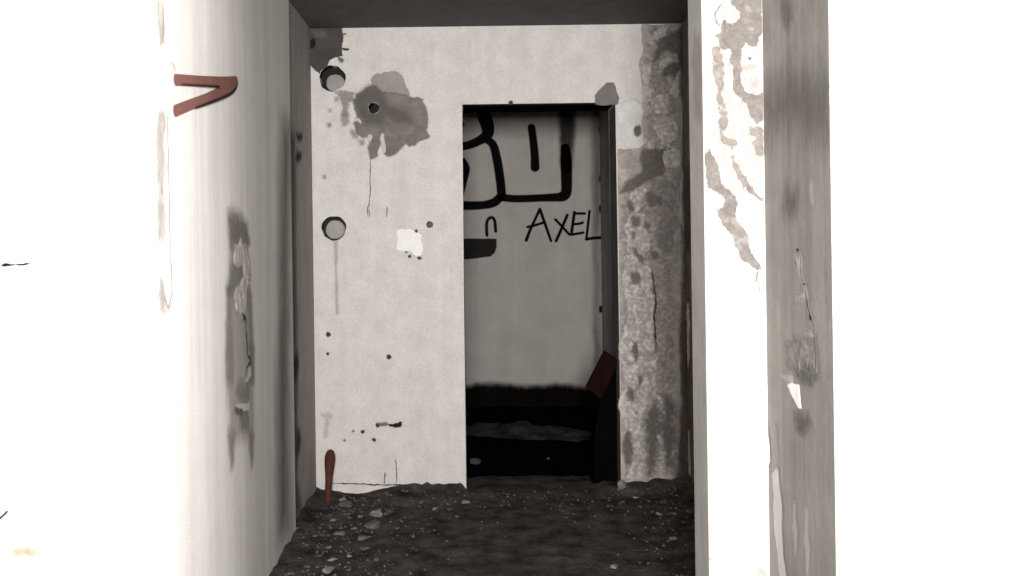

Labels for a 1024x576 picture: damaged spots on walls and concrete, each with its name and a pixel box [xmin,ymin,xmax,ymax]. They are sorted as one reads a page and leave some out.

leakage [353,72,429,159]
spalling [595,82,619,105]
peeling [705,0,764,291]
spalling [227,216,254,462]